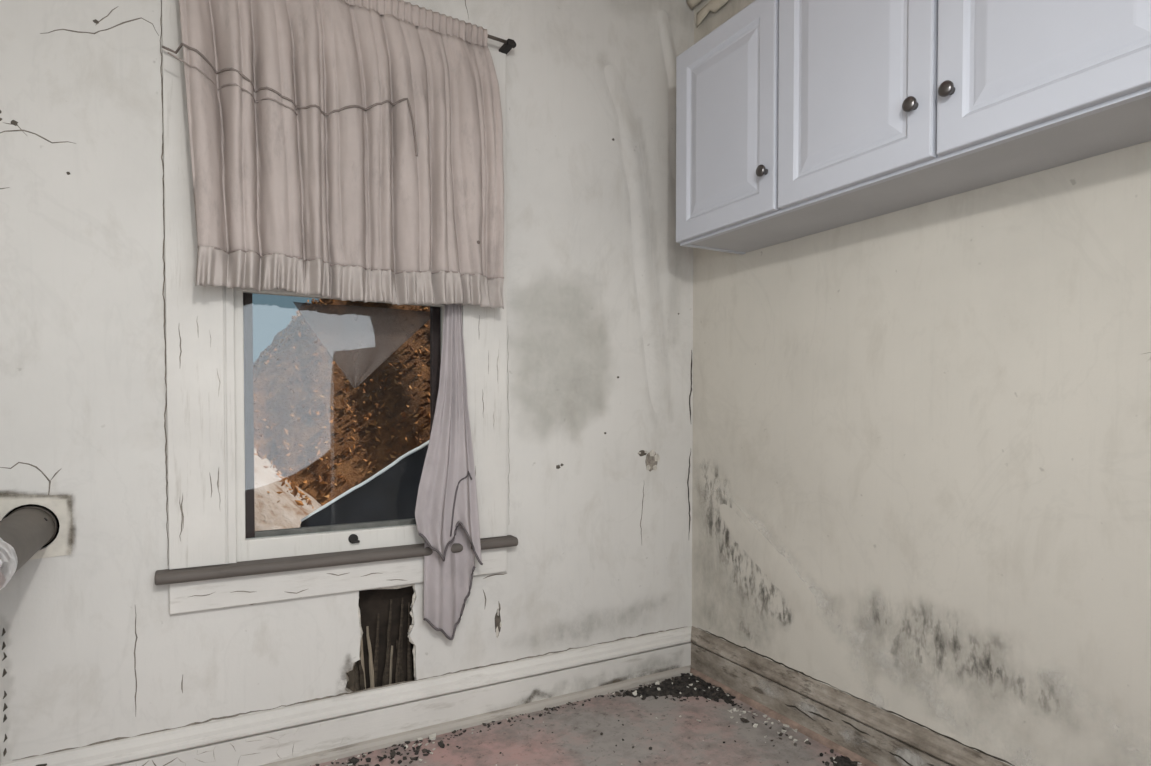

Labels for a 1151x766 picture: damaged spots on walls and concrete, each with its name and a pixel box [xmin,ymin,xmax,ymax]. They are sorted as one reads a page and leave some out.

crack [40,1,221,558]
spalling [345,584,416,693]